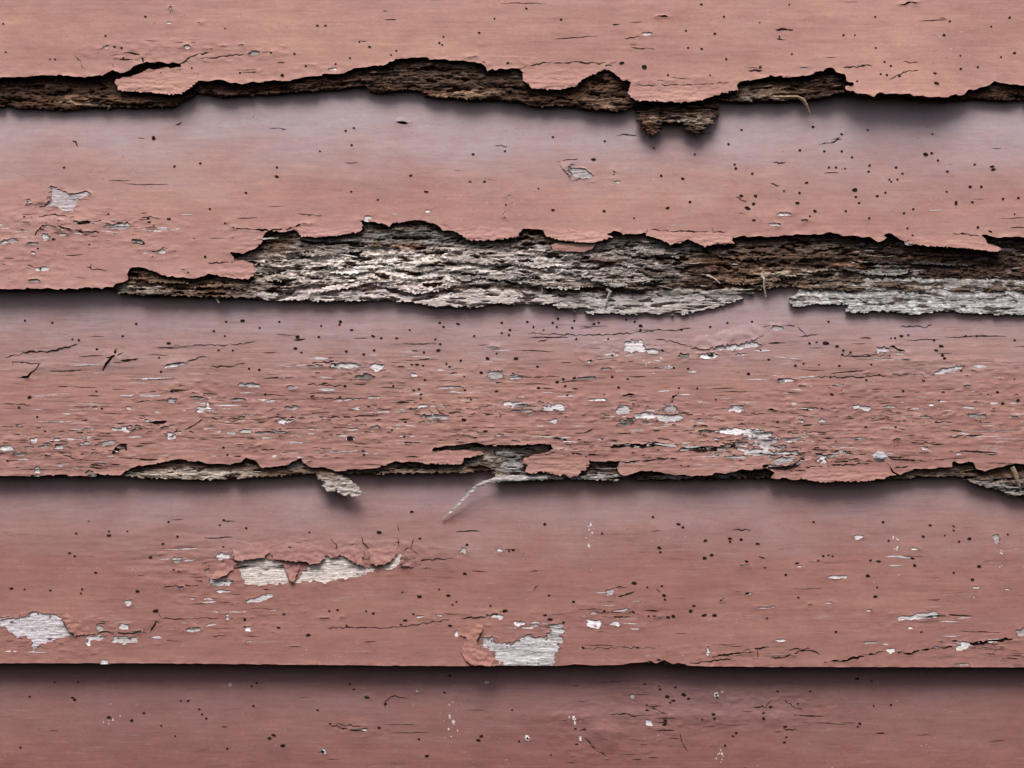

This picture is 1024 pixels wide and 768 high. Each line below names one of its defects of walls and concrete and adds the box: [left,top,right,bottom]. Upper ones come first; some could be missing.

peeling [115,69,199,95]
peeling [523,65,613,90]
peeling [627,84,737,103]
peeling [543,226,613,252]
peeling [643,228,734,247]
peeling [904,235,1000,252]
peeling [214,261,255,279]
peeling [410,397,890,483]
peeling [308,456,365,497]
peeling [177,540,422,632]
peeling [0,611,141,653]
peeling [454,614,565,667]